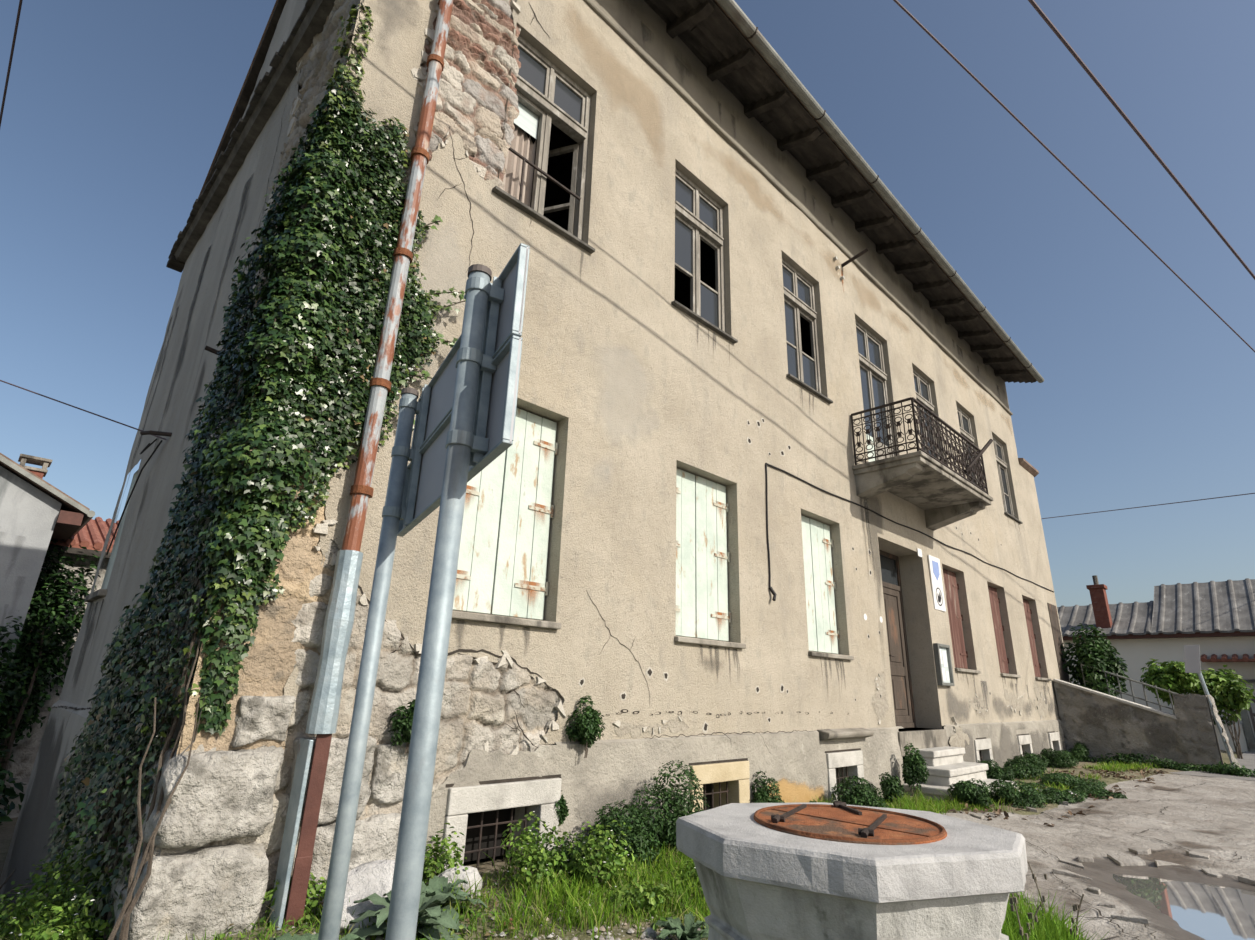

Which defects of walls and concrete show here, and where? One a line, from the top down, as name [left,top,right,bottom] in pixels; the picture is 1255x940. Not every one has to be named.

spalling [411,0,521,189]
crack [436,127,474,272]
spalling [153,0,369,925]
spalling [358,619,422,820]
spalling [432,650,567,795]
crack [586,590,650,705]
crack [643,730,815,753]
crack [1026,841,1176,940]
crack [1046,782,1254,868]